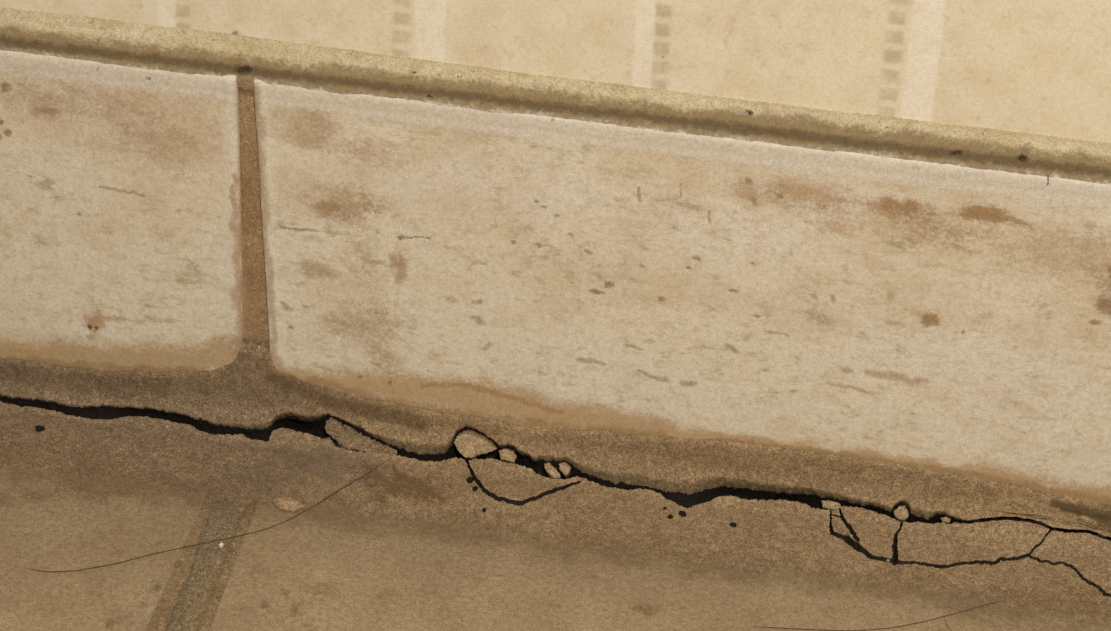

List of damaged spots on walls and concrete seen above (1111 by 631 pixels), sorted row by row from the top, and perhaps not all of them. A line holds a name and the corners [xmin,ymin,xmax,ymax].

leakage [0,335,249,372]
leakage [276,366,719,440]
crack [0,395,1111,597]
leakage [867,448,1111,530]